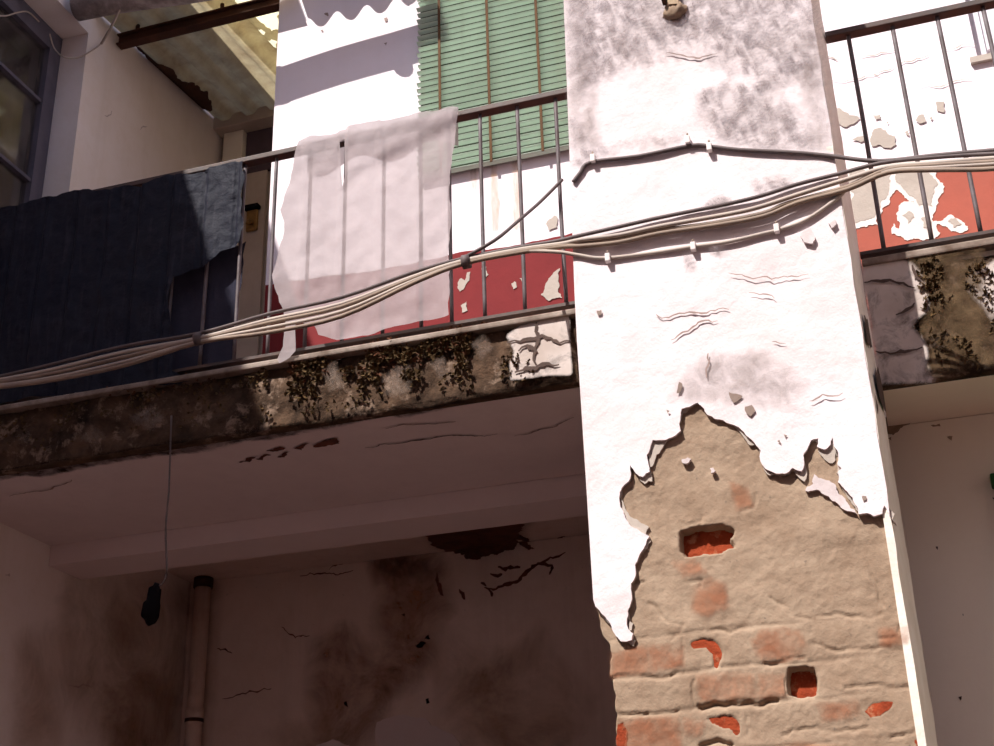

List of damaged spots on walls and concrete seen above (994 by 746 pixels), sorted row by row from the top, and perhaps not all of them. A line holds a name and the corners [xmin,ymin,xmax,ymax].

damp [572,0,814,144]
peeling [852,115,909,148]
peeling [848,160,968,241]
peeling [458,272,470,291]
peeling [541,268,562,301]
spalling [864,315,872,348]
damp [0,378,572,478]
peeling [239,438,339,463]
peeling [729,392,755,416]
spalling [875,368,910,440]
crack [435,552,566,600]
flaking render [597,404,918,746]